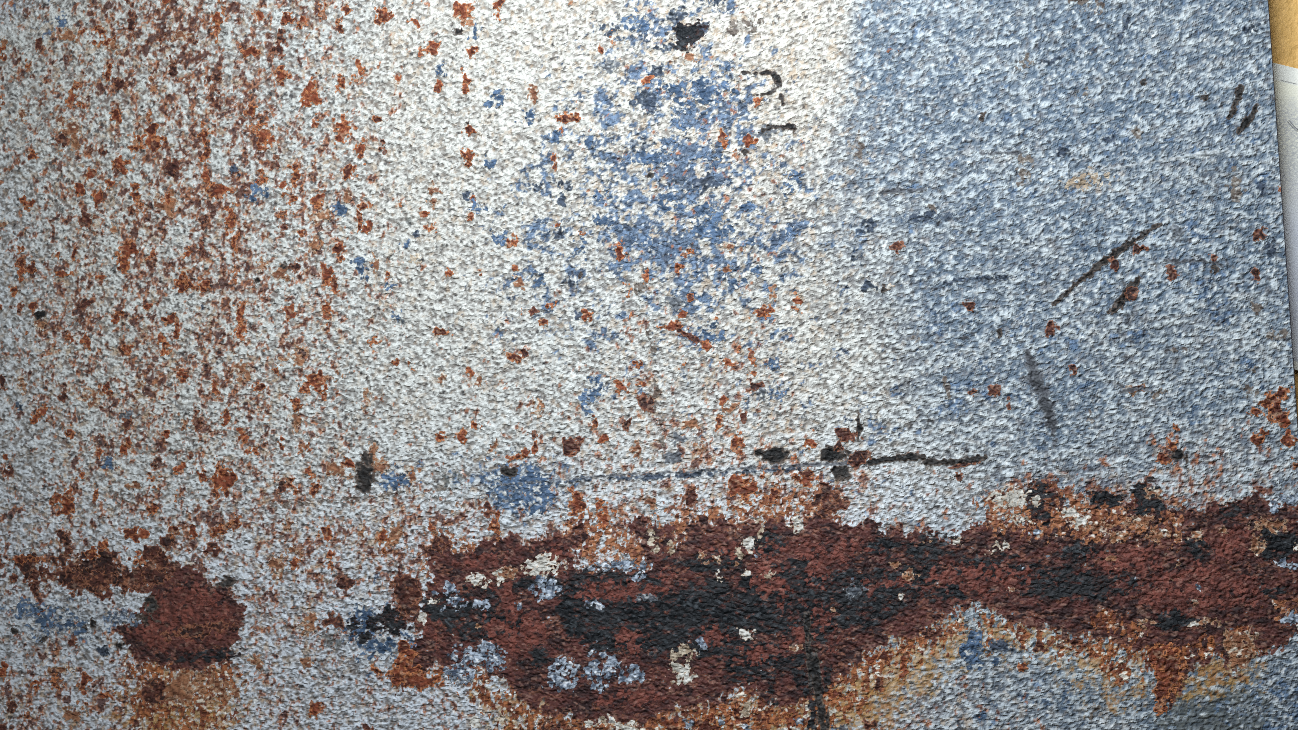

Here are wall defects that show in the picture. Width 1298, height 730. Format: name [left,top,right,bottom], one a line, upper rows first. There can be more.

rust [239,2,353,86]
rust [374,0,441,57]
rust [25,0,227,280]
rust [166,58,391,326]
rust [0,246,37,312]
rust [143,303,189,386]
rust [212,301,356,498]
rust [485,398,609,463]
rust [613,360,655,458]
rust [681,342,769,455]
rust [1246,386,1298,470]
rust [355,421,1298,730]